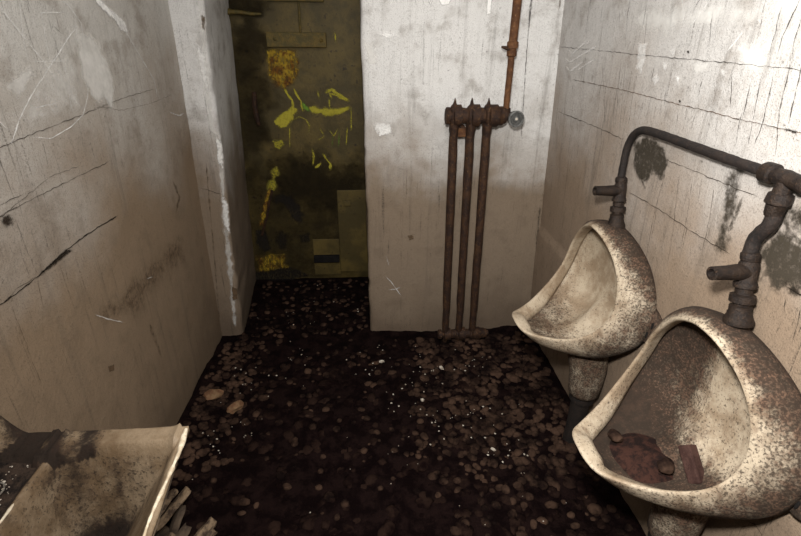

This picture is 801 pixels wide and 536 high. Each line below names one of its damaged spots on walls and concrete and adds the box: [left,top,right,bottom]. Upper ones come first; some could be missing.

crack [575,80,801,133]
damp [634,137,667,186]
crack [1,162,107,225]
crack [0,216,116,340]
crack [631,193,728,253]
damp [716,169,743,250]
damp [761,211,801,294]